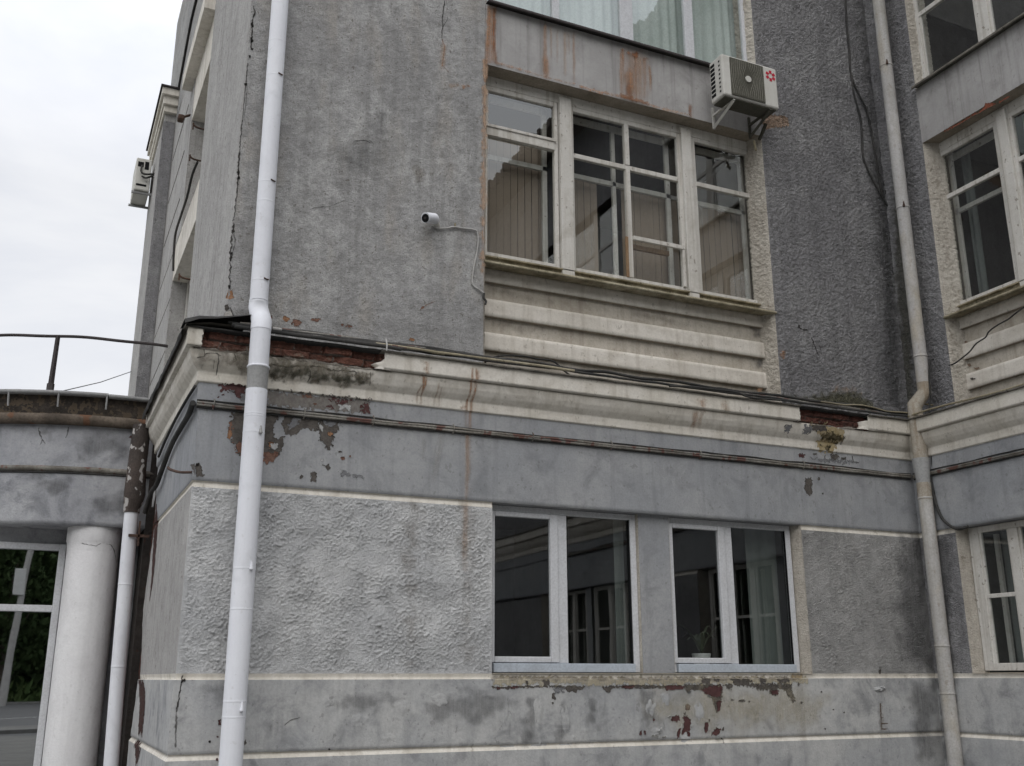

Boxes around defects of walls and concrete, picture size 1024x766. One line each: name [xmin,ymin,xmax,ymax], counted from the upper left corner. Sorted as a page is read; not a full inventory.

corrosion [482,8,521,149]
crack [228,7,256,283]
spalling [194,329,250,355]
spalling [269,340,390,372]
spalling [191,463,205,477]
peeling [217,382,246,456]
peeling [263,389,372,482]
spalling [784,409,875,496]
crack [175,675,185,747]
peeling [492,679,585,704]
peeling [602,677,803,743]